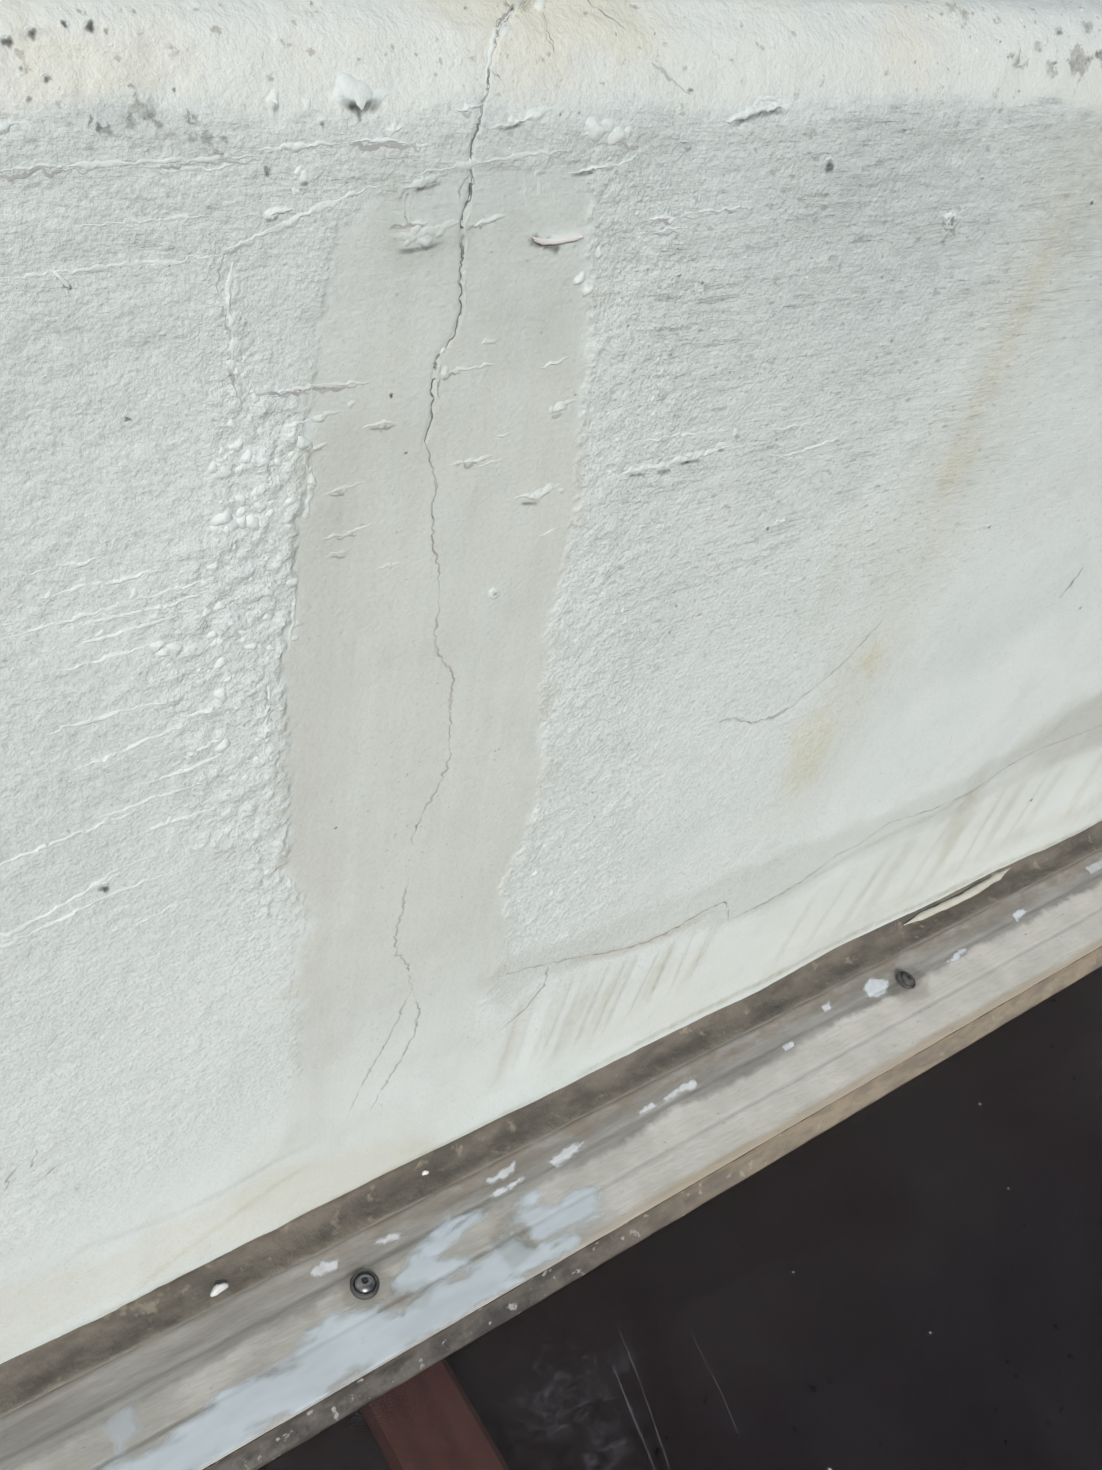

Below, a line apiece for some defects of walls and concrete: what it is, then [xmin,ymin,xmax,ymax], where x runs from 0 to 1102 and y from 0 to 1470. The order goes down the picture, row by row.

crack [587,0,625,29]
crack [347,0,555,1117]
crack [499,726,1099,1030]